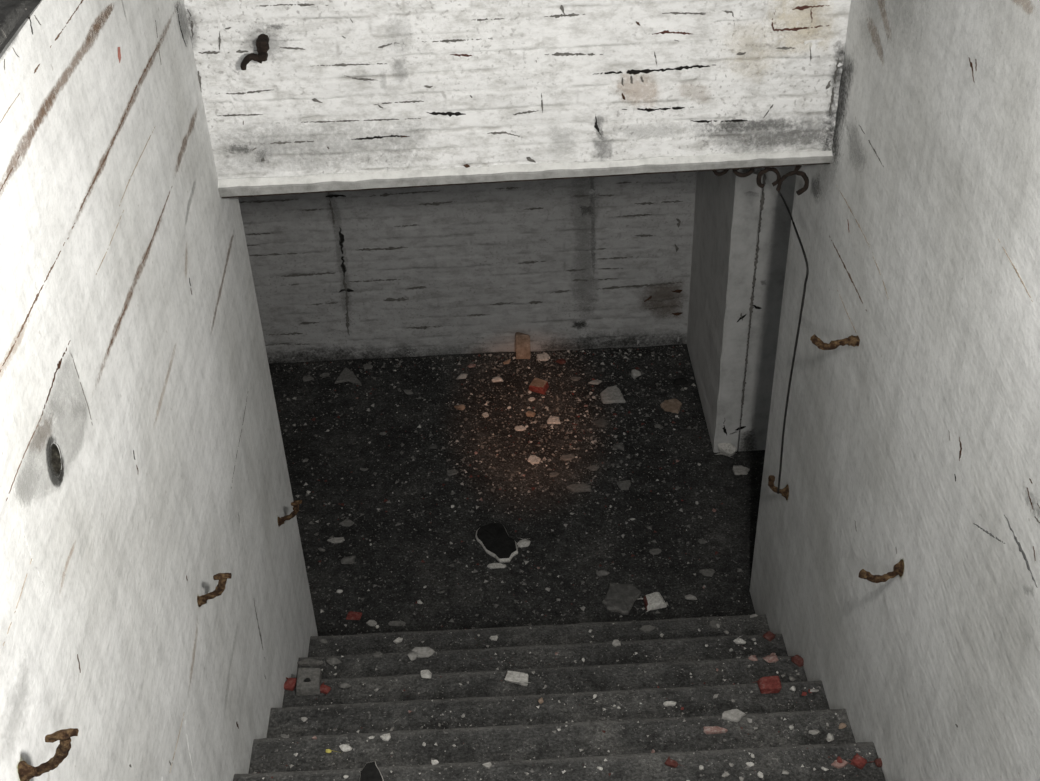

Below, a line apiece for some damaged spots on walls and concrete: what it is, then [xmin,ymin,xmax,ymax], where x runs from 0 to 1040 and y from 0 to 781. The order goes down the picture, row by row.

rust [0,6,172,372]
crack [326,192,354,334]
spalling [6,341,93,501]